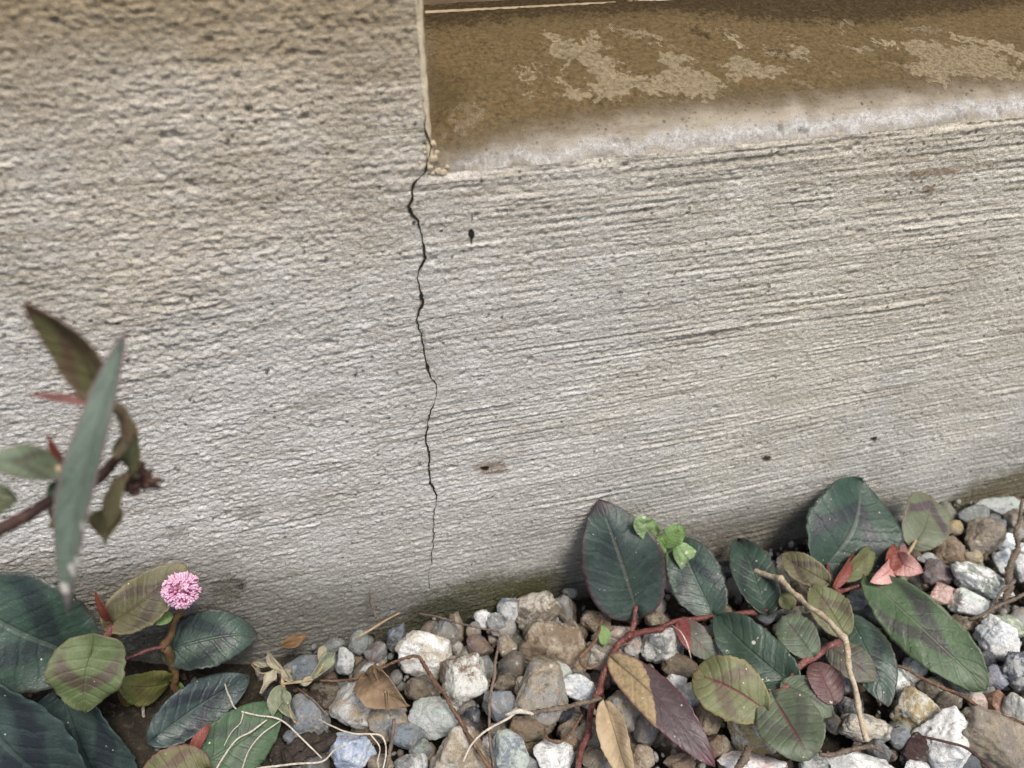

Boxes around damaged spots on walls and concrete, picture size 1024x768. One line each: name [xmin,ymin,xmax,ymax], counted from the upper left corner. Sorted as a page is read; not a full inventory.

peeling [513,29,813,105]
leakage [423,0,1024,152]
peeling [838,31,1024,91]
crack [398,100,442,589]